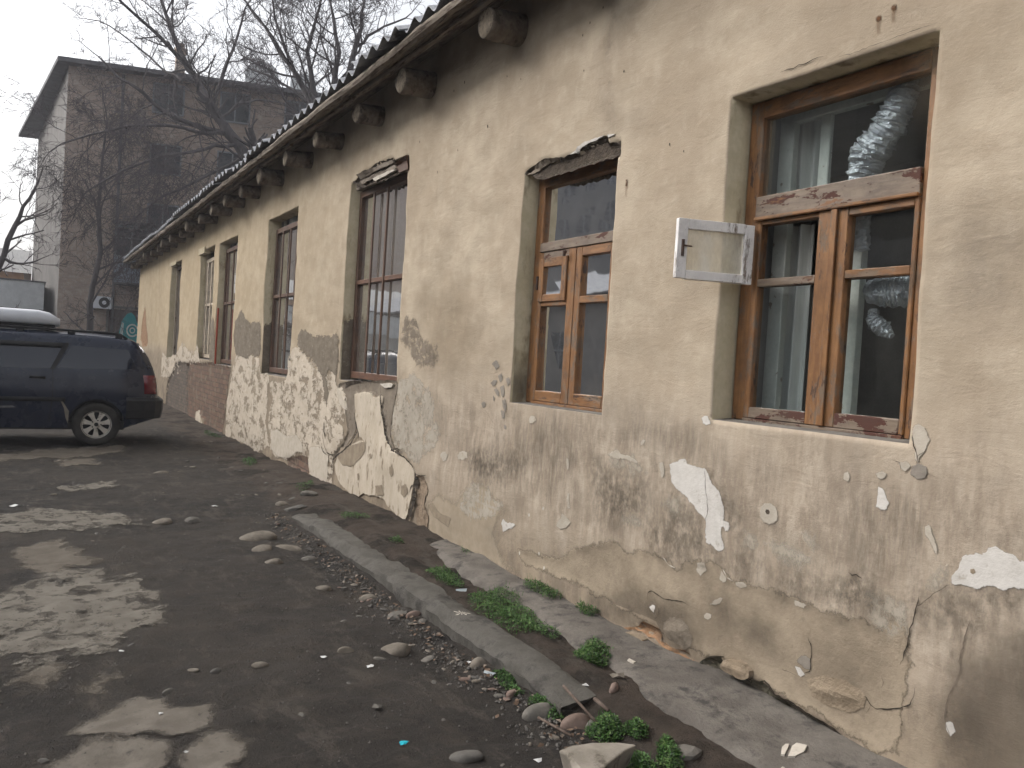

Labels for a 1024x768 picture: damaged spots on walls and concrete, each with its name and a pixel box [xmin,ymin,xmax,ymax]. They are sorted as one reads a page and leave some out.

spalling [525,134,621,180]
peeling [161,343,515,570]
flaking render [517,459,913,754]
crack [866,585,947,713]
crack [944,623,970,745]
peeling [951,546,1024,591]